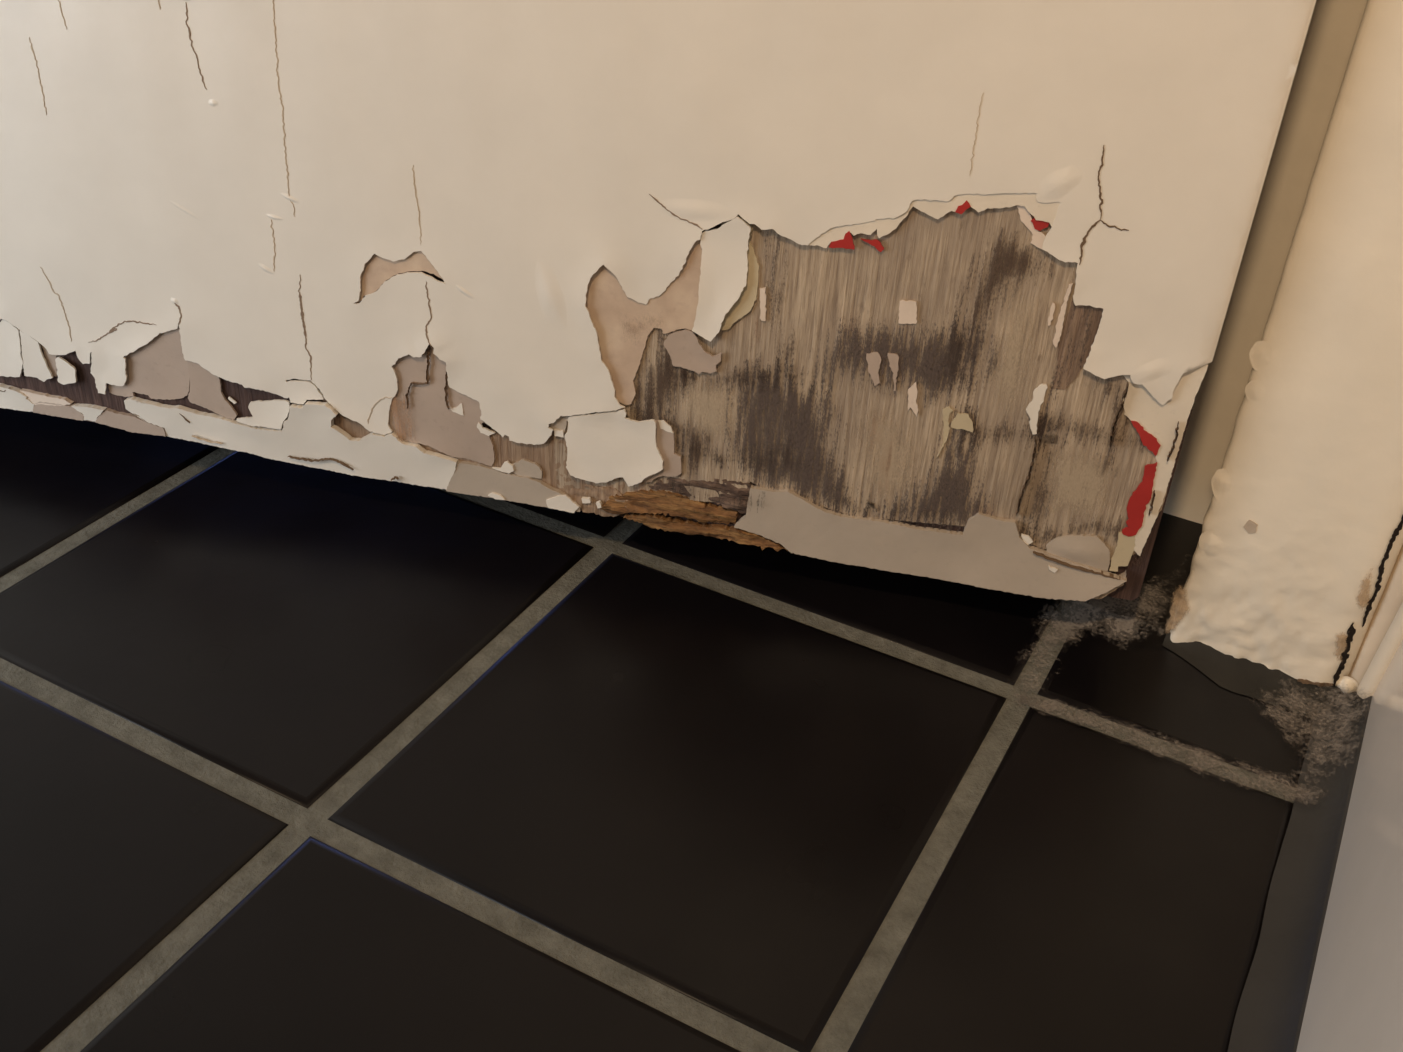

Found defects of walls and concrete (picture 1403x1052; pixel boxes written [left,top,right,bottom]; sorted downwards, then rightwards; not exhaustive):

peeling [355,251,443,303]
crack [1079,145,1129,265]
peeling [0,319,371,438]
peeling [389,193,1208,601]
leakage [630,230,1143,546]
crack [1297,515,1403,687]
leakage [1019,585,1321,803]
leakage [1266,689,1365,772]